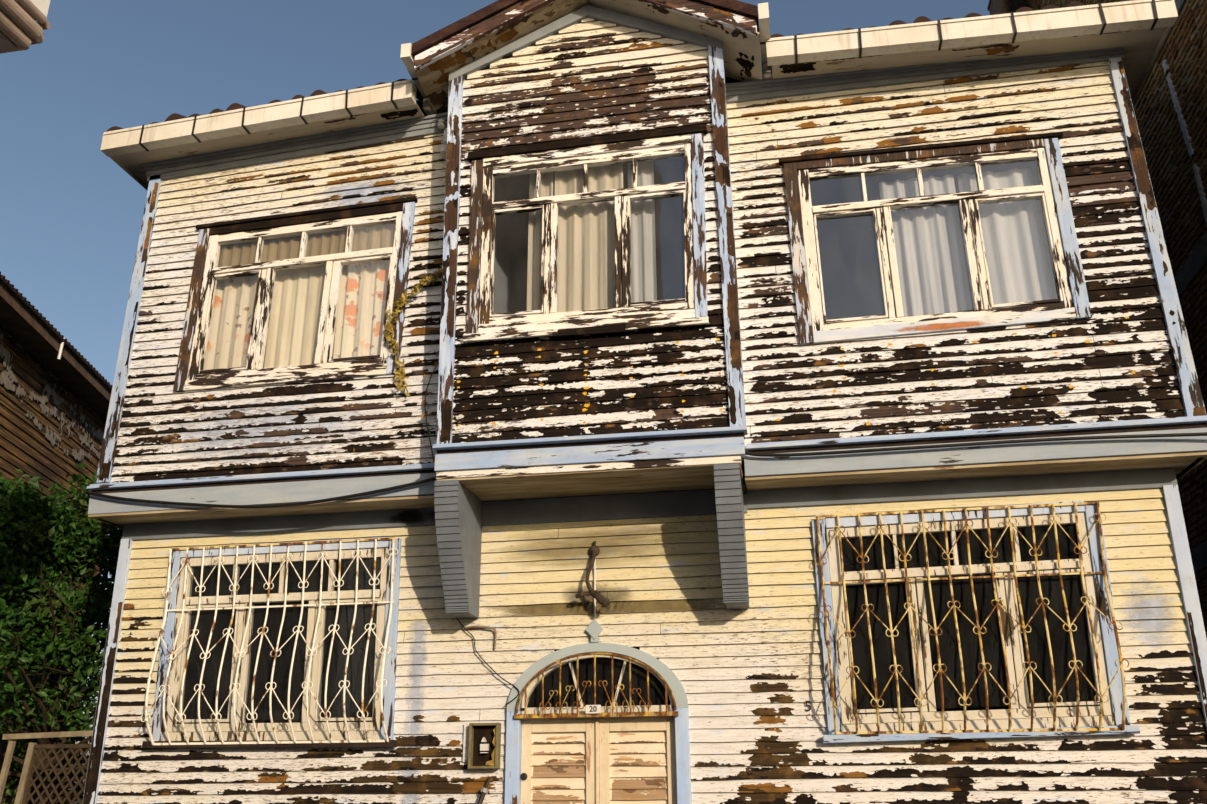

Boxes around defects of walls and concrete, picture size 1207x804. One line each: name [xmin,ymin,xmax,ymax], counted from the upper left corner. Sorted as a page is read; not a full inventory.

peeling [0,0,1206,483]
peeling [83,602,503,804]
peeling [532,741,585,804]
peeling [611,740,666,800]
peeling [691,612,1207,804]